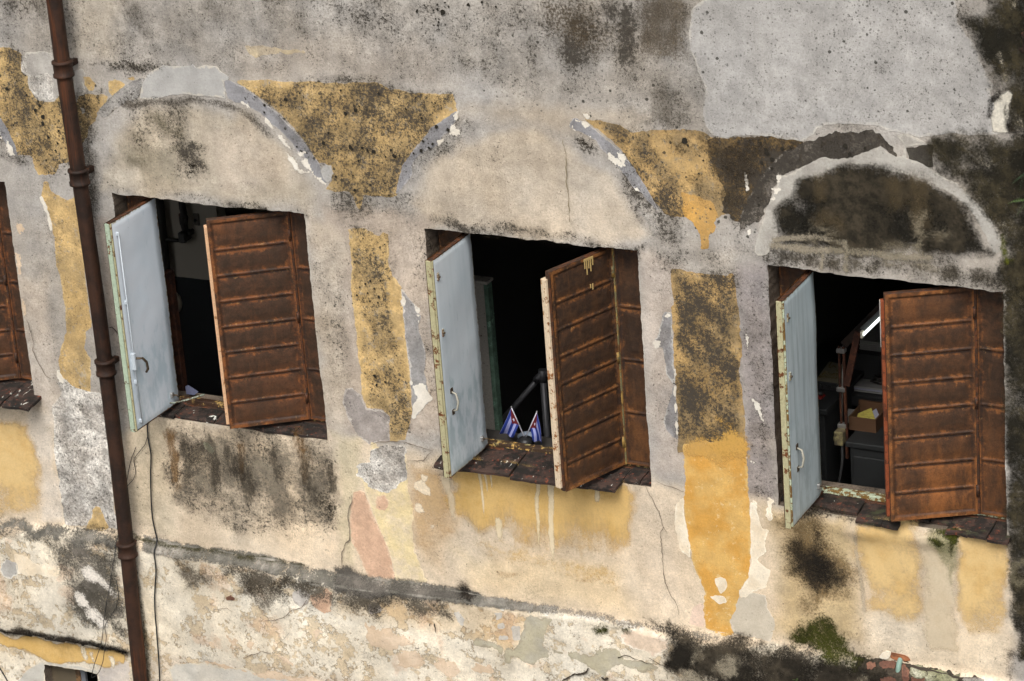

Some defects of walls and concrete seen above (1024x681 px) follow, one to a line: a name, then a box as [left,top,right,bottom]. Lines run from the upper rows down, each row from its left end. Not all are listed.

peeling [237,79,460,210]
peeling [569,114,803,249]
spalling [0,47,117,531]
water stain [773,0,1024,675]
spalling [19,661,130,681]
water stain [169,433,342,526]
peeling [343,228,433,584]
water stain [133,533,888,681]
water stain [414,472,633,557]
flaking render [473,608,668,676]
crack [647,483,684,615]
peeling [653,269,774,636]